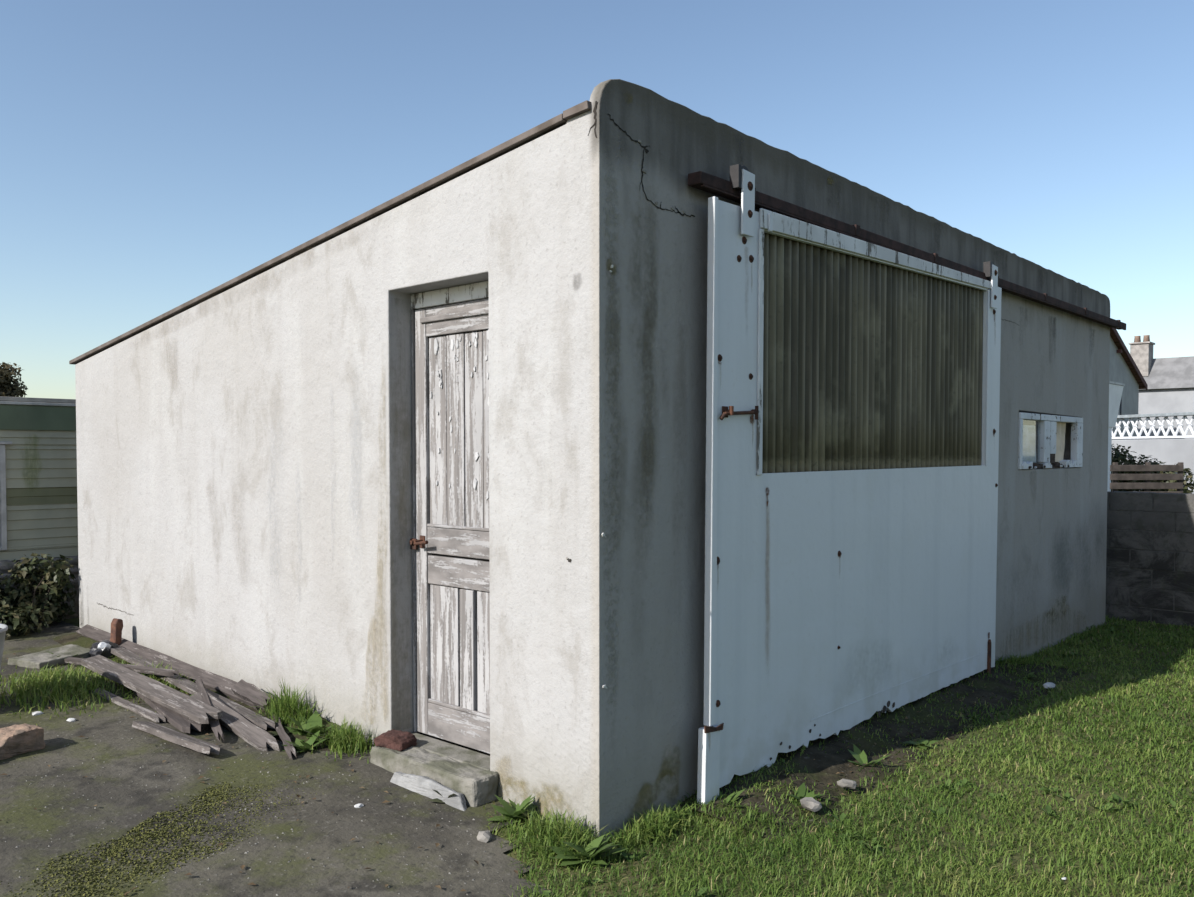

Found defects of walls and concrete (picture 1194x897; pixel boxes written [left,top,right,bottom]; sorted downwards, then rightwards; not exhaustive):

crack [588,101,695,217]